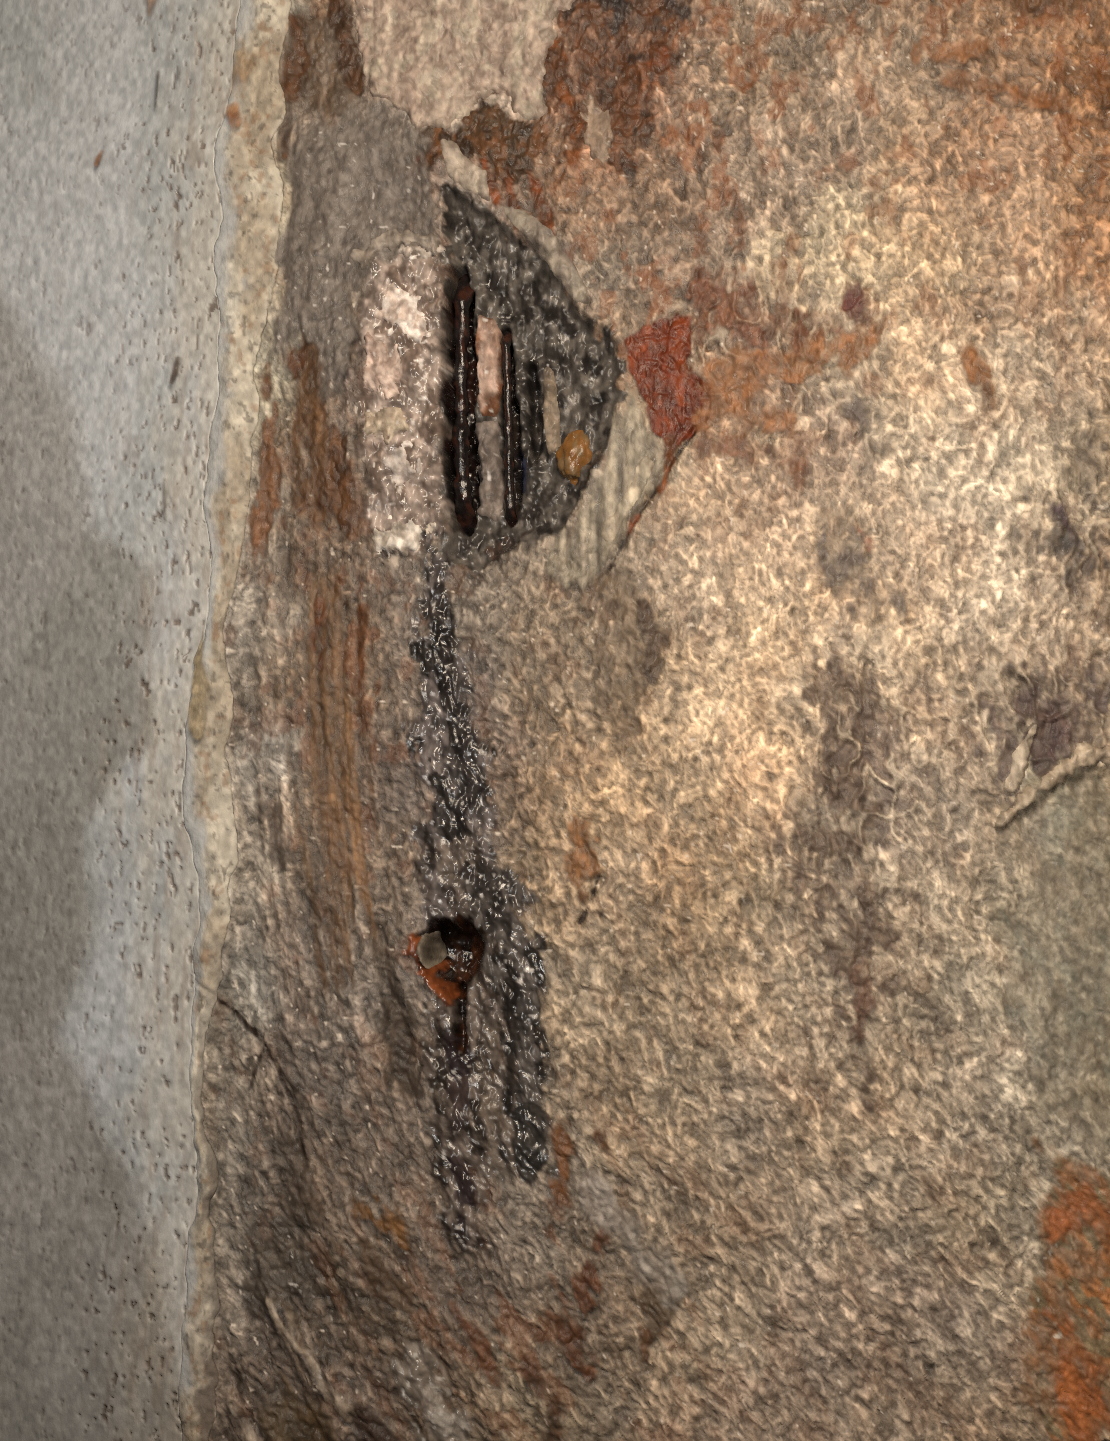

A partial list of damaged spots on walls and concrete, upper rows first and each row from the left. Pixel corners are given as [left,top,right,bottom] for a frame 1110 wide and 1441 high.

spalling [274,0,664,588]
rust [625,265,878,493]
leakage [402,523,559,1248]
rust [1022,1156,1110,1441]